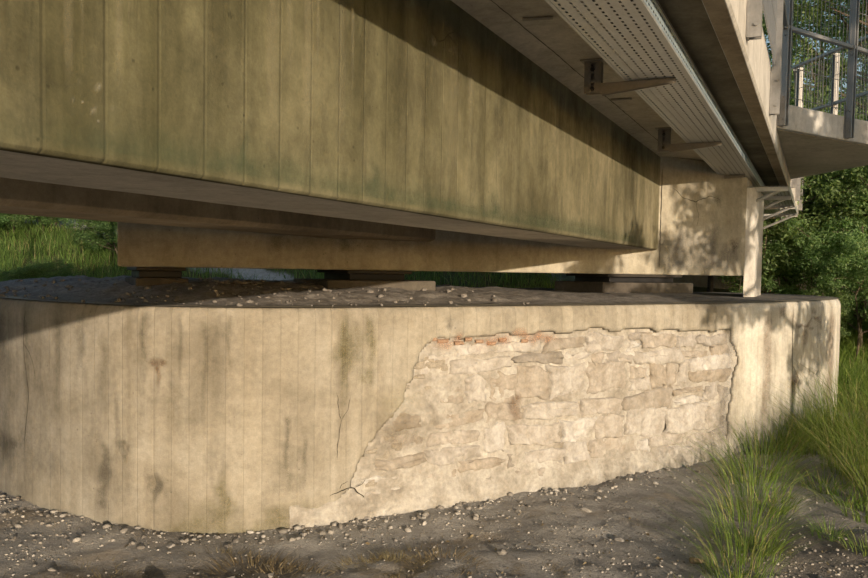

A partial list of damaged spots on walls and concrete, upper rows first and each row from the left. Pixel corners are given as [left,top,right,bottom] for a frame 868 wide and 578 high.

crack [659,186,713,267]
spalling [289,328,749,528]